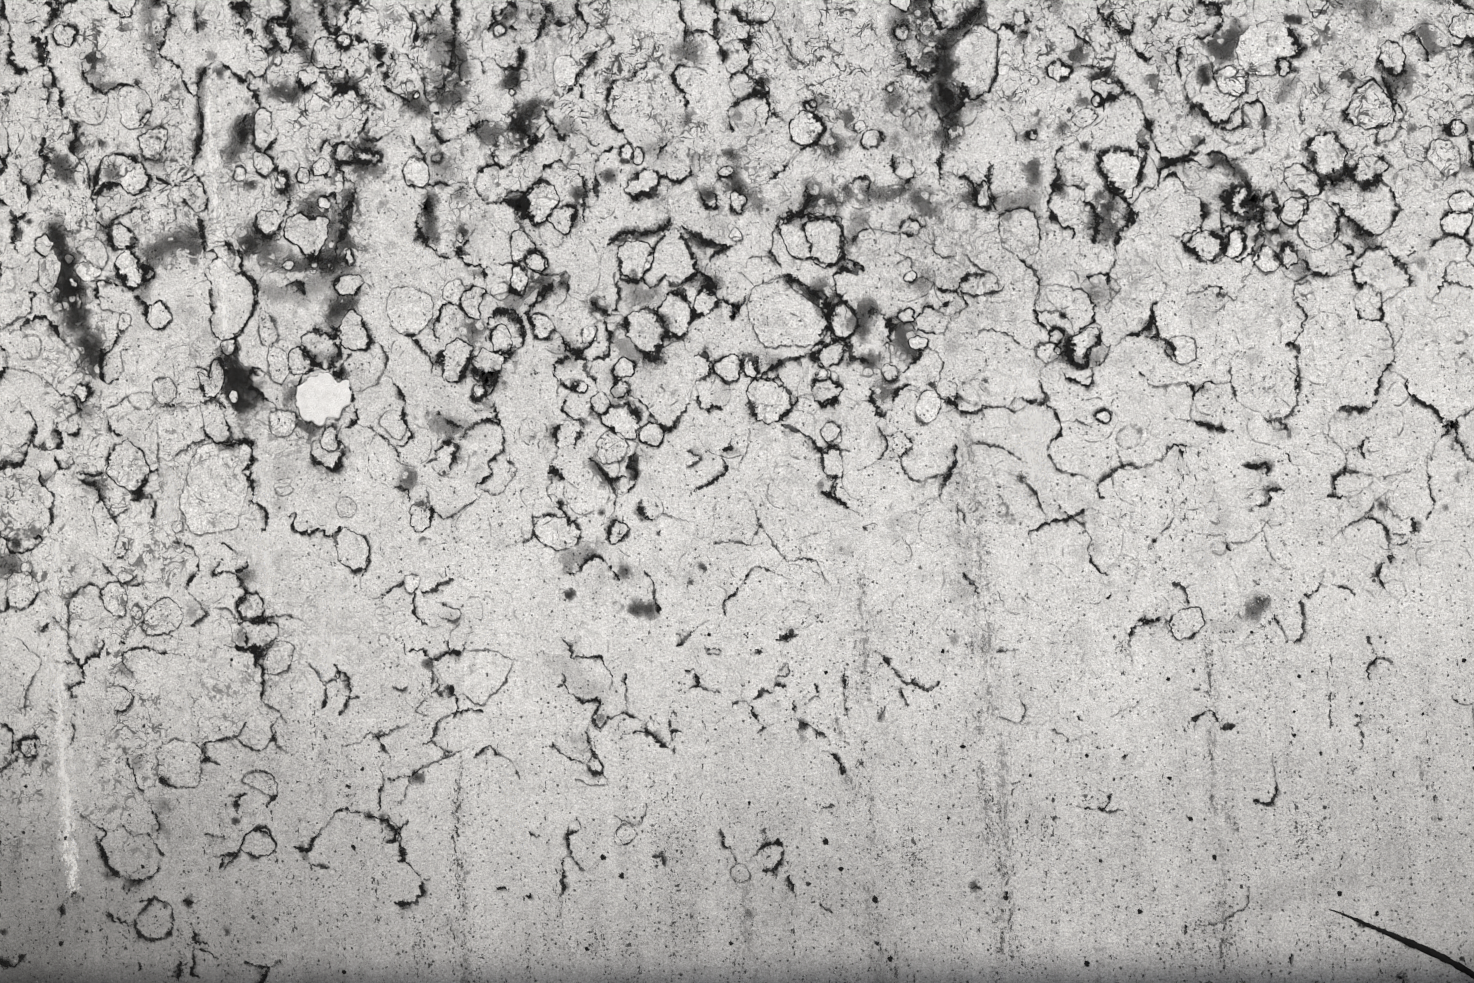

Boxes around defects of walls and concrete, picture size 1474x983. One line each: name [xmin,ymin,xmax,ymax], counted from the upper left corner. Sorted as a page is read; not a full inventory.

damp [911,0,959,146]
crack [1375,75,1403,144]
crack [1452,0,1474,10]
damp [48,222,102,372]
crack [1301,162,1474,499]
crack [0,0,1312,870]
crack [1274,473,1436,643]
crack [1366,635,1394,680]
crack [80,813,281,983]
crack [386,815,430,909]
crack [719,828,832,913]
crack [1184,895,1249,935]